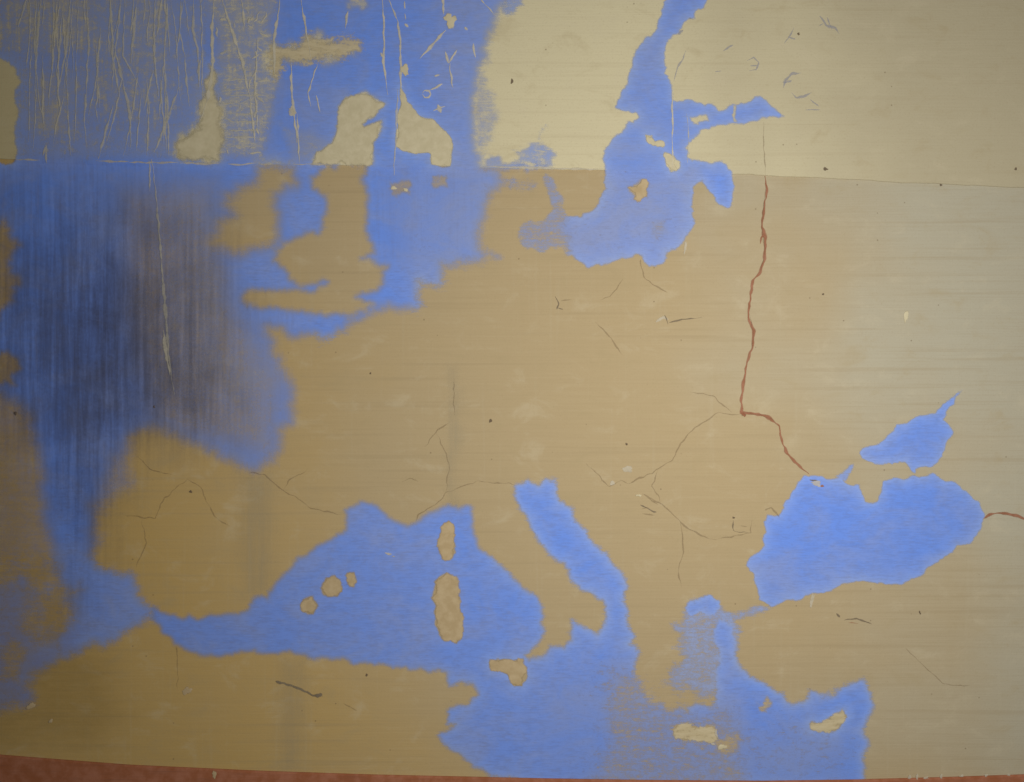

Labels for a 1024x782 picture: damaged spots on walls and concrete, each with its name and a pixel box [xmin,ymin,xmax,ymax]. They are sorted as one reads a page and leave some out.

peeling [520,0,781,267]
leakage [149,159,174,391]
peeling [0,0,594,708]
crack [740,177,809,474]
crack [985,511,1024,519]